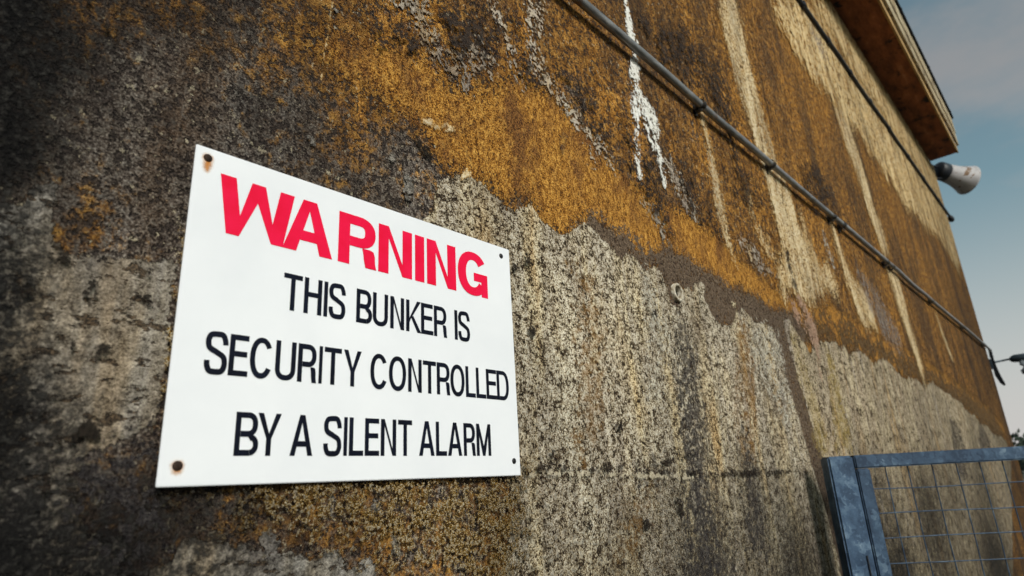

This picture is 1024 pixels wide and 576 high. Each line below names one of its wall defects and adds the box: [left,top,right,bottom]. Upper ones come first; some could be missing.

leakage [65,420,174,565]
leakage [372,0,1005,576]